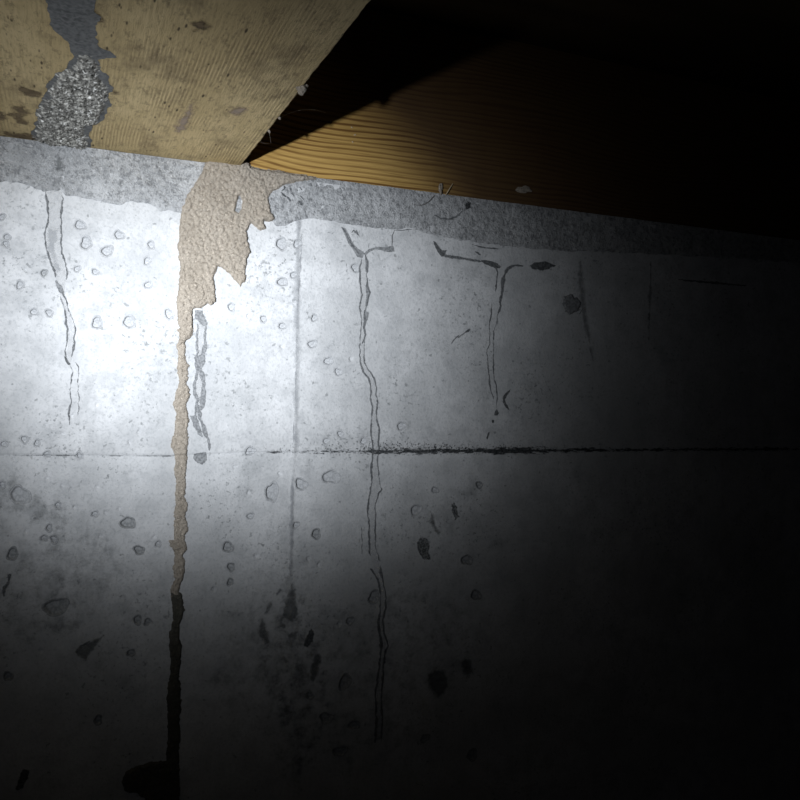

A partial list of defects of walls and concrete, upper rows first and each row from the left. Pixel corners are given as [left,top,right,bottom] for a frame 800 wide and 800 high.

crack [44,192,80,425]
crack [270,227,800,742]
leakage [122,592,185,800]